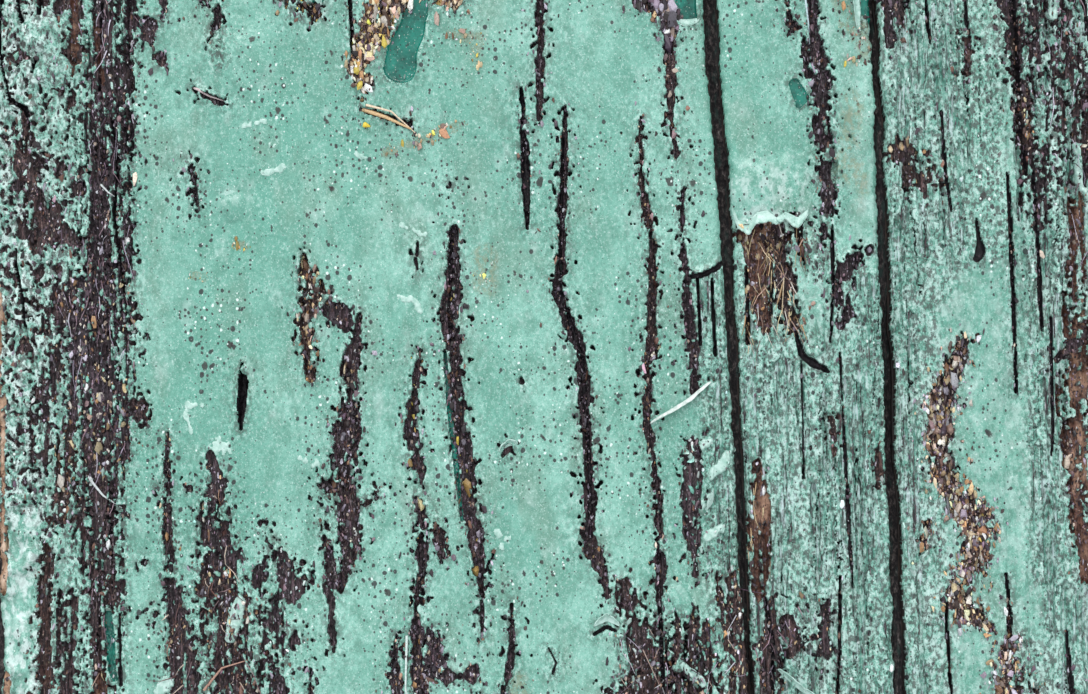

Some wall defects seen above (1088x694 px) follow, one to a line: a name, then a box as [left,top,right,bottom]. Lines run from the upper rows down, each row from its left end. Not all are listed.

peeling [0,0,338,694]
crack [237,363,251,431]
crack [282,178,533,694]
crack [517,0,774,694]
peeling [592,0,973,694]
crack [785,0,914,589]
peeling [999,0,1088,694]